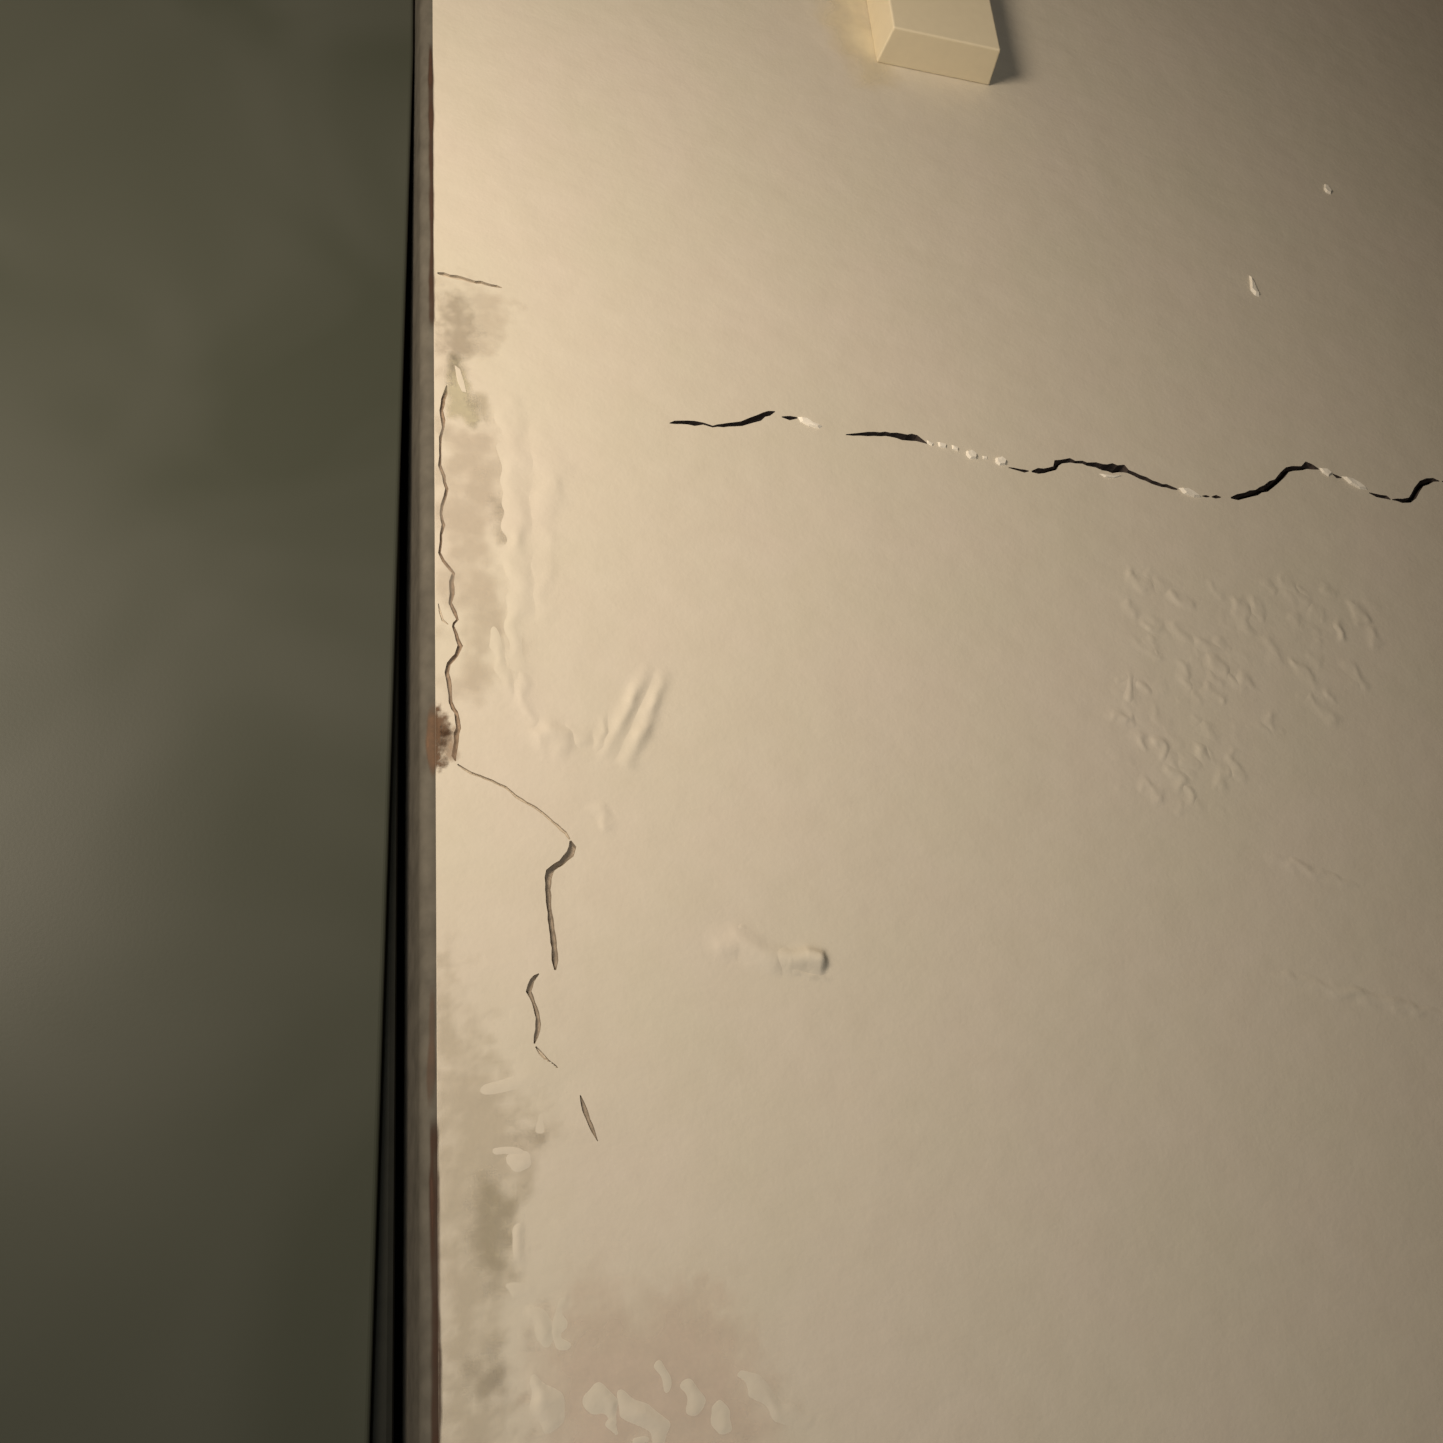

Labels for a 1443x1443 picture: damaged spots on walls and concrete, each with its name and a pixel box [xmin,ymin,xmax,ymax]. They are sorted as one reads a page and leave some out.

crack [670,411,1443,503]
rust [426,707,452,770]
crack [438,385,576,1068]
crack [580,1095,598,1141]